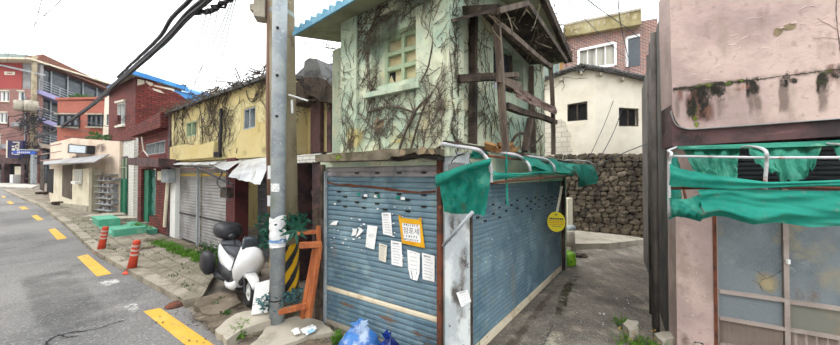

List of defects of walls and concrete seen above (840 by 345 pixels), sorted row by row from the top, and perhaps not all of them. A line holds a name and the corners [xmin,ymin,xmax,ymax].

crack [673,0,840,93]
damp [676,83,726,140]
damp [739,78,761,108]
damp [779,73,797,110]
damp [816,65,840,109]